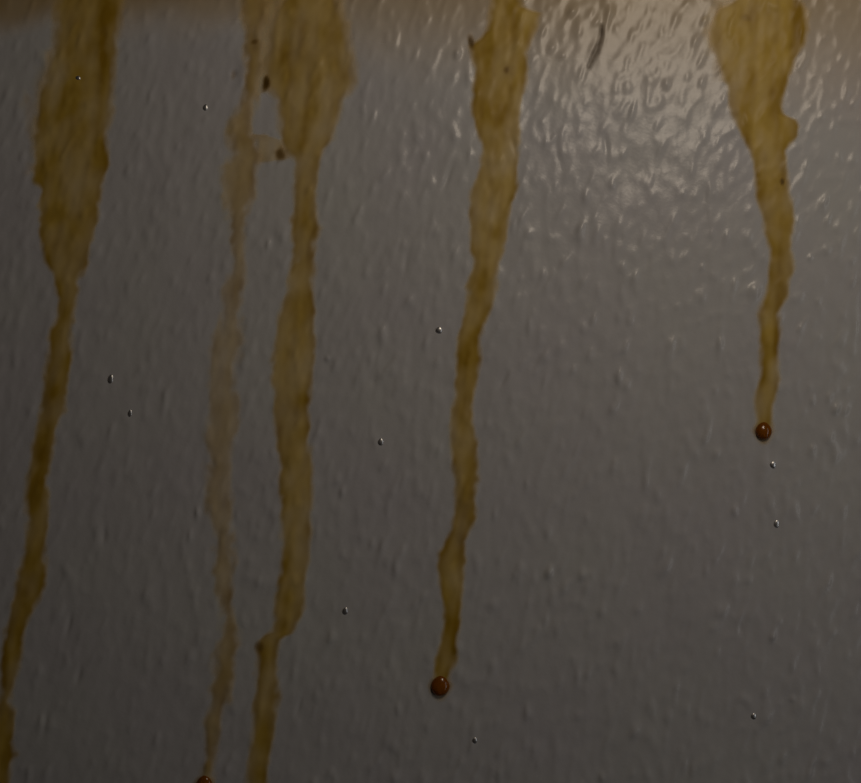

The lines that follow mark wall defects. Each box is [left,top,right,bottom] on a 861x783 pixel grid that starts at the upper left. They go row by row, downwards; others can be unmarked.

damp [0,0,356,783]
damp [336,0,861,697]